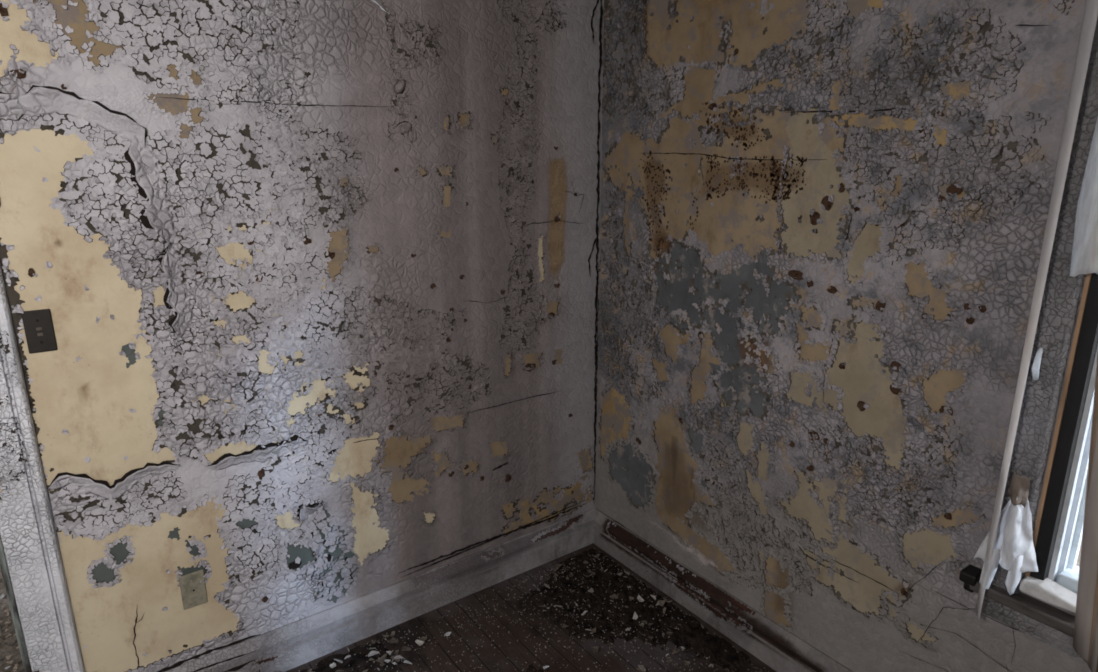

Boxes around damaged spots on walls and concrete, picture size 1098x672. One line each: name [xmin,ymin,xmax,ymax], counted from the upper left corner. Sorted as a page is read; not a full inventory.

crack [162,97,391,107]
damp [639,150,674,257]
damp [689,102,807,230]
peeling [0,0,563,672]
peeling [596,0,1051,652]
peeling [481,474,595,562]
crack [799,545,1026,672]